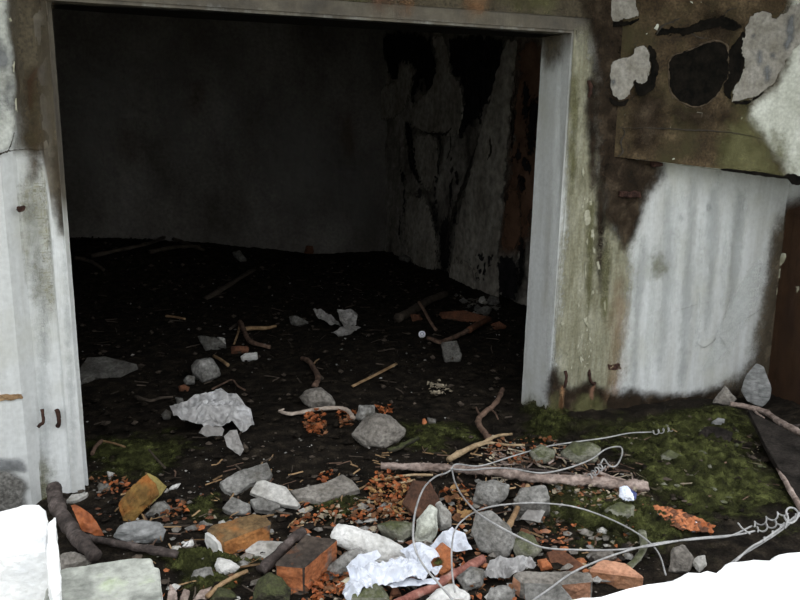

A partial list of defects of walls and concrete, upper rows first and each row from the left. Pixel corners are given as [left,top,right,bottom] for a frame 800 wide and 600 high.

damp [11,0,64,230]
damp [348,0,792,315]
peeling [609,0,800,110]